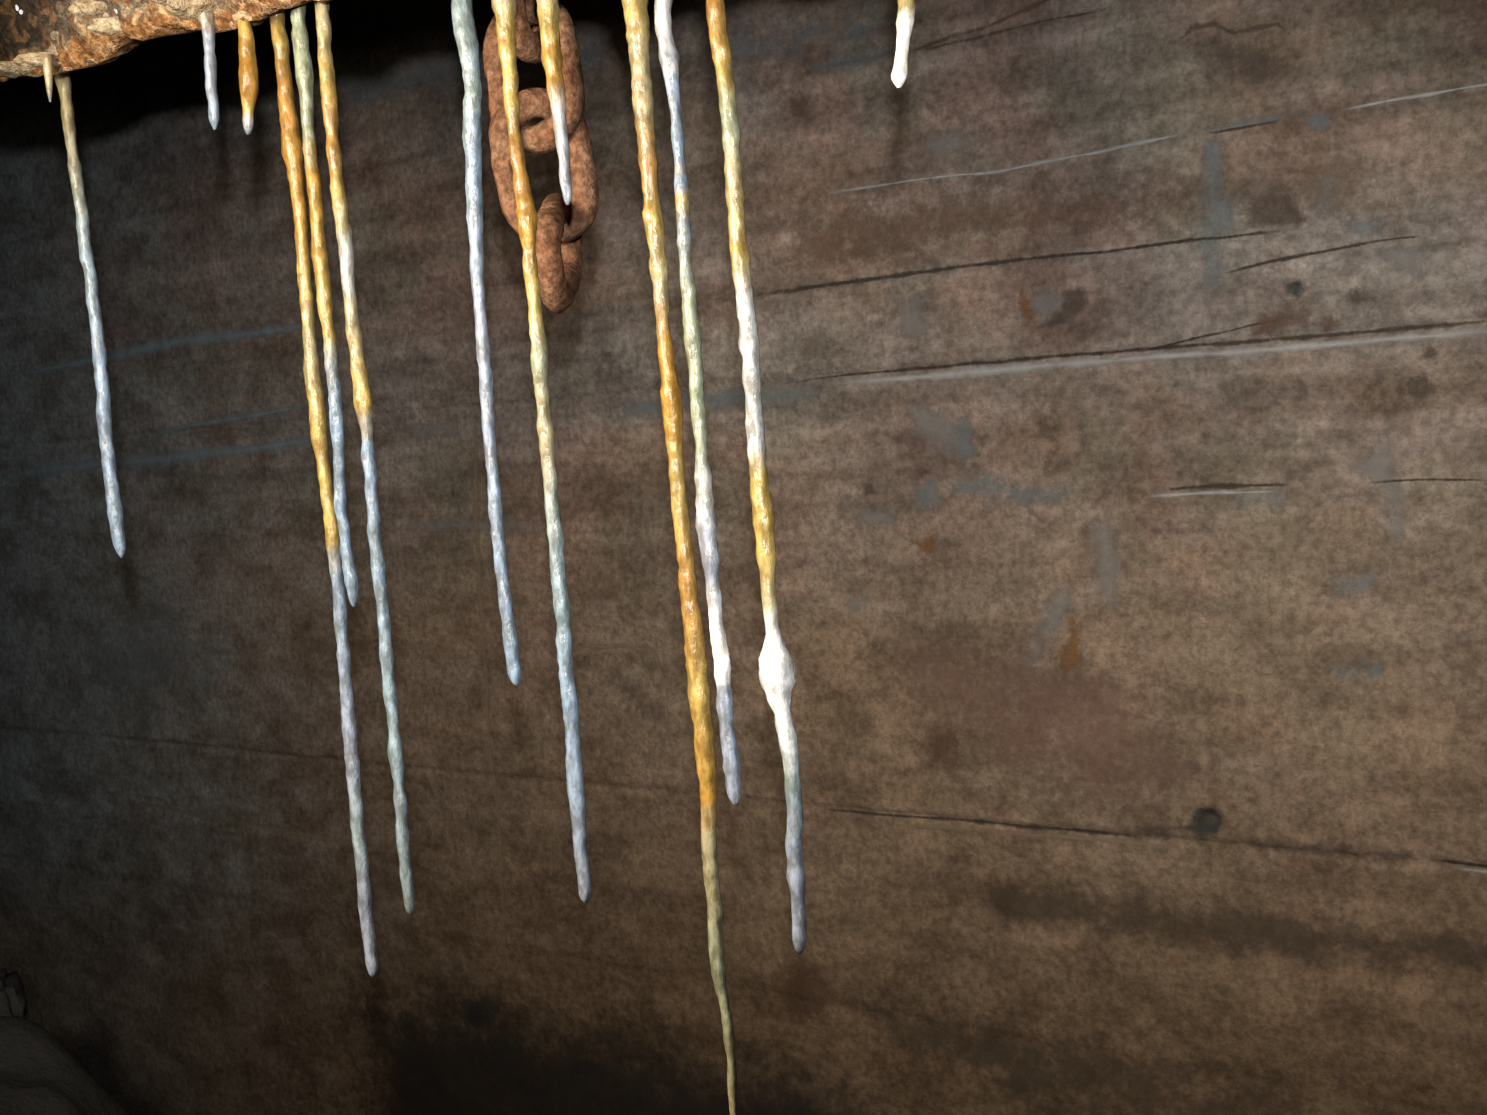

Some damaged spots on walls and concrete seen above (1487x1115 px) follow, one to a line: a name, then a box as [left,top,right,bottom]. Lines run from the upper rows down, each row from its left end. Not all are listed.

efflorescence [68,0,123,36]
leakage [149,0,218,20]
crack [774,232,1414,293]
leakage [28,324,301,374]
crack [816,322,1486,383]
crack [834,809,1161,846]
crack [1443,860,1487,873]